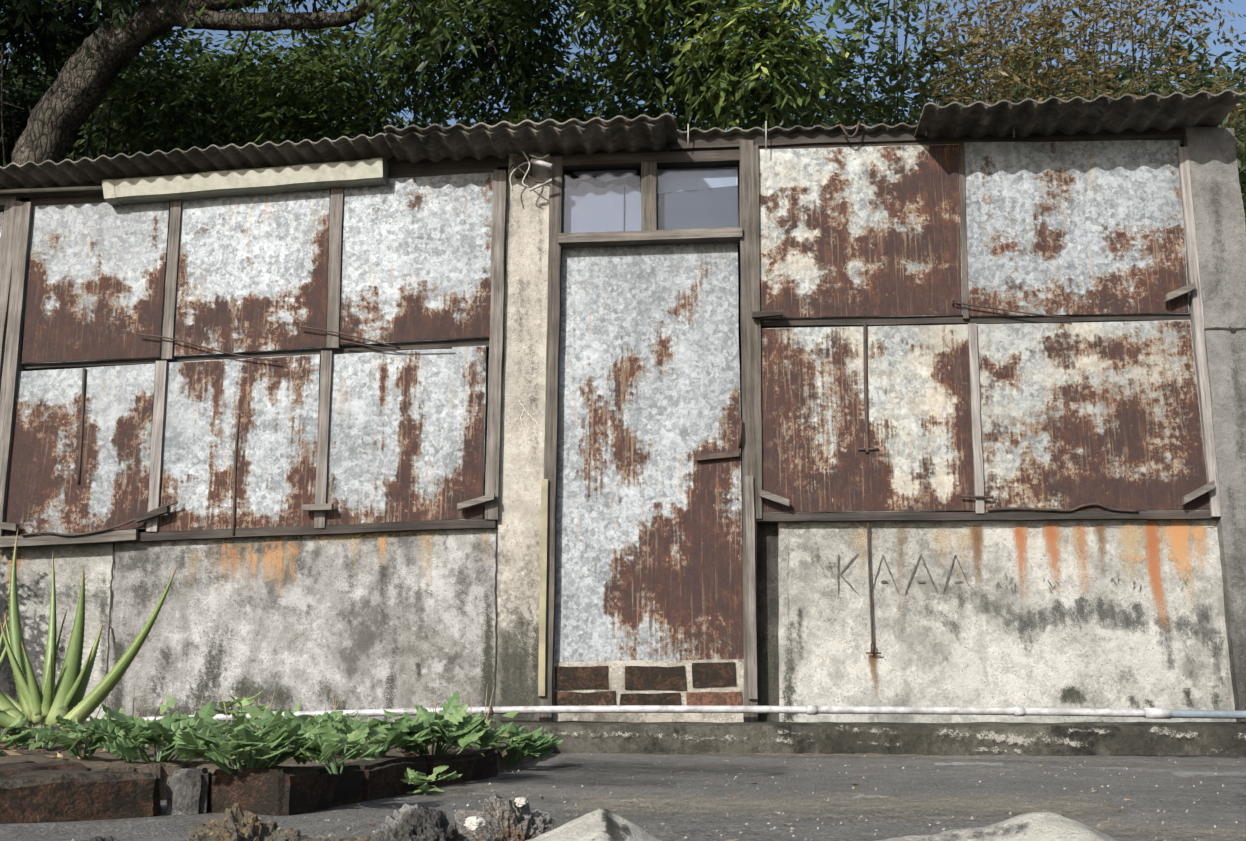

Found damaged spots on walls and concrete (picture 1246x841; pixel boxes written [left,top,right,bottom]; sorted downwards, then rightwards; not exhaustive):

corrosion [3,173,492,589]
corrosion [576,264,715,502]
corrosion [759,144,1210,623]
corrosion [598,386,744,661]
water stain [906,577,1224,710]